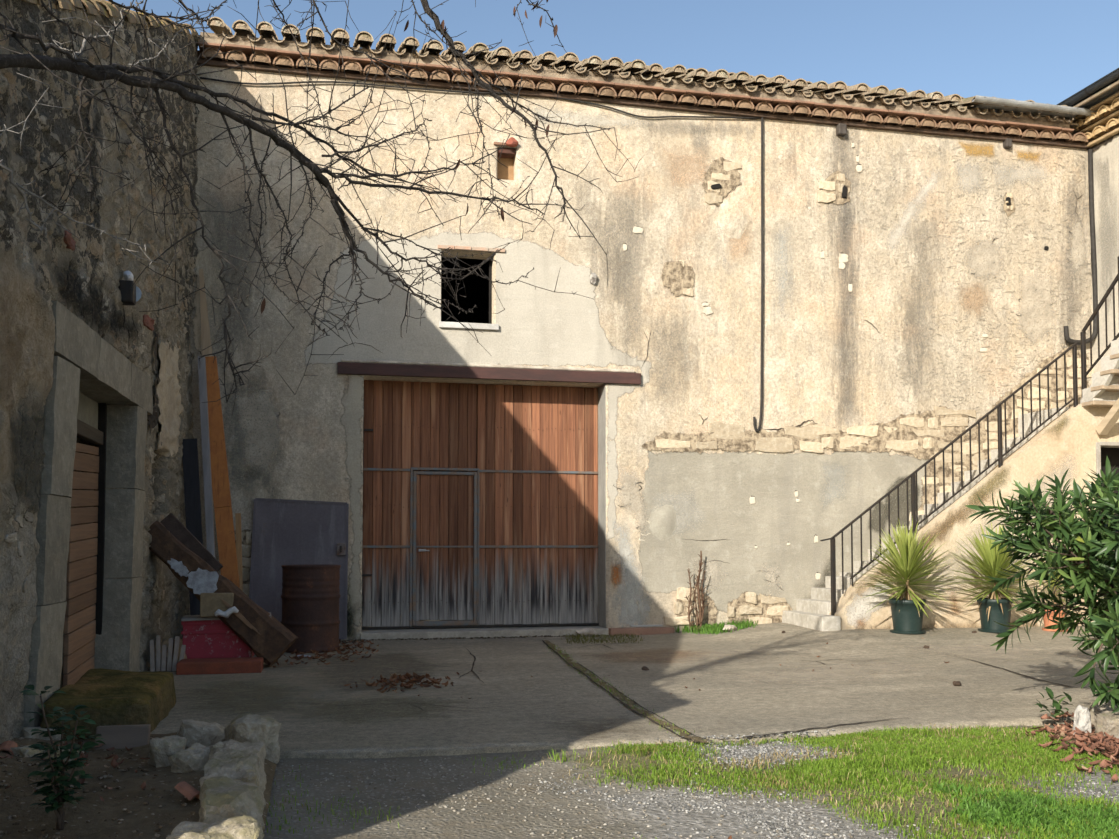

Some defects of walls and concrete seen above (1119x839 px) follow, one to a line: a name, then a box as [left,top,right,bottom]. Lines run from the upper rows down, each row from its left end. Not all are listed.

spalling [702,157,742,207]
spalling [818,142,862,205]
spalling [661,260,713,315]
spalling [642,348,1094,521]
crack [314,649,515,711]